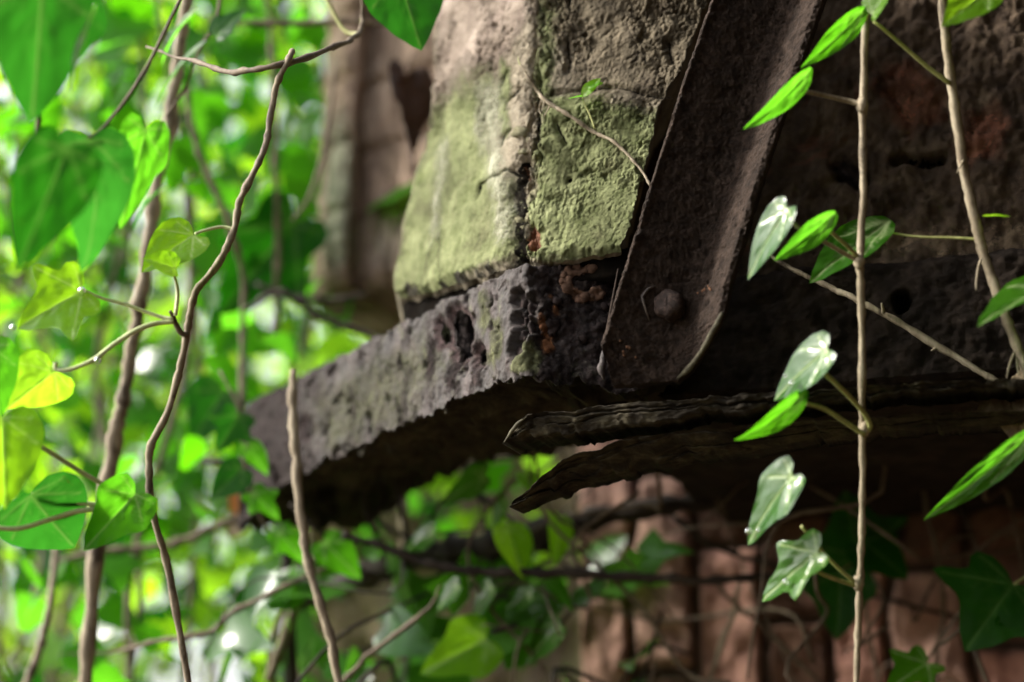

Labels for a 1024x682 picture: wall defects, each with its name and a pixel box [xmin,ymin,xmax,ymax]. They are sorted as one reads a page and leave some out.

leakage [431,0,707,240]
leakage [421,139,447,293]
peeling [404,281,421,297]
peeling [438,262,497,289]
spalling [456,313,487,363]
corrosion [538,295,558,353]